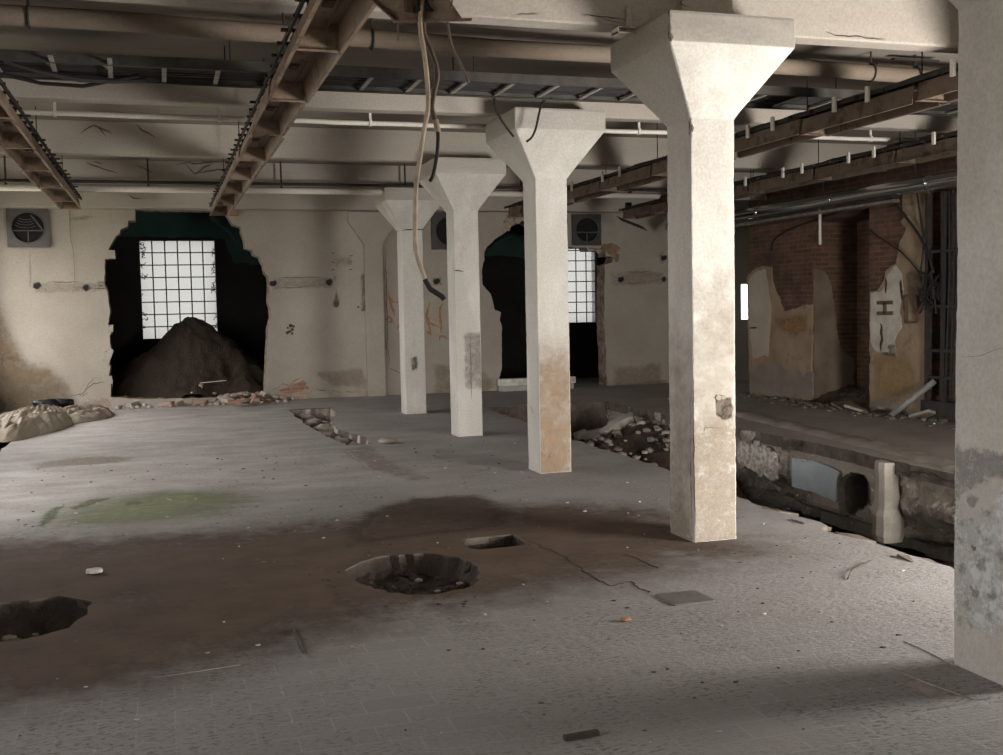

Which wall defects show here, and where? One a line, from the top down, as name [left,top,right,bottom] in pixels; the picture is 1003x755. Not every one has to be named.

peeling [751,362,814,398]
peeling [955,448,1003,507]
crack [530,541,658,594]